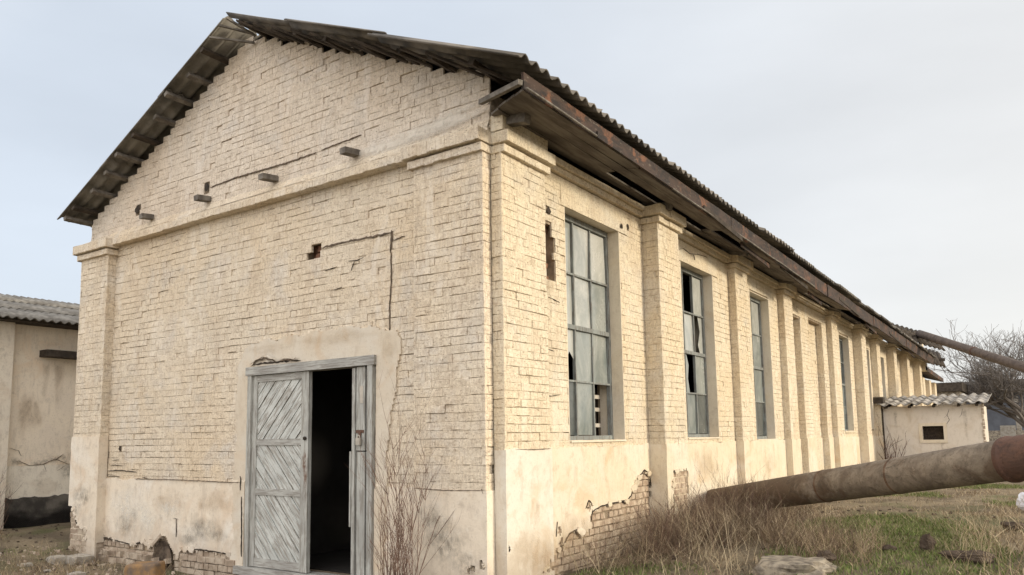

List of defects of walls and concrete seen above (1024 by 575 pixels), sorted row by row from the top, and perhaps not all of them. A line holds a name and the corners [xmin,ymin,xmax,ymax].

crack [210,135,360,188]
crack [323,230,404,330]
flaking render [250,355,301,366]
flaking render [672,468,688,518]
flaking render [550,469,652,575]
spalling [104,535,231,570]